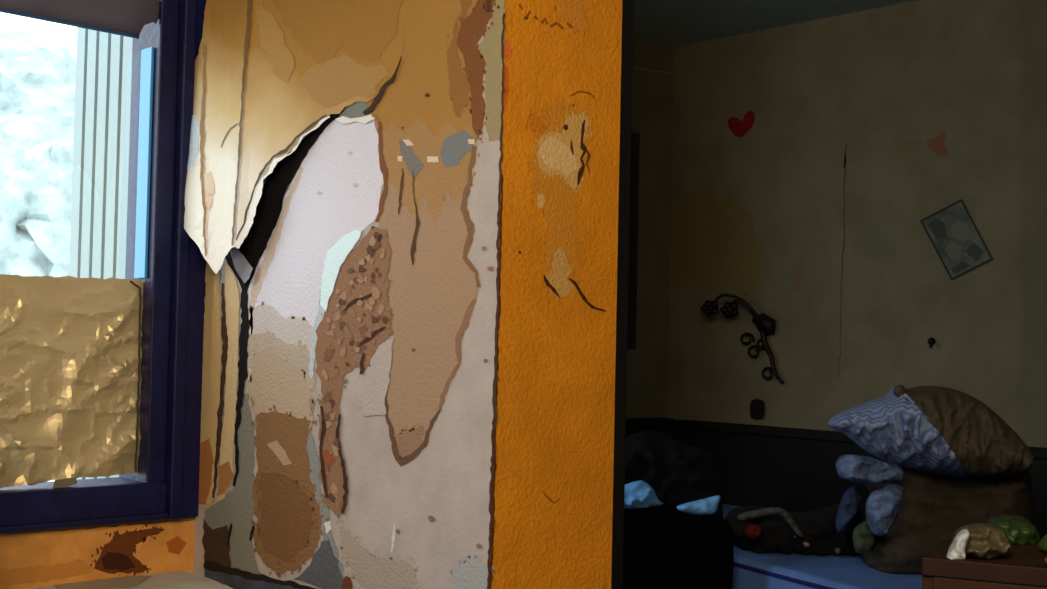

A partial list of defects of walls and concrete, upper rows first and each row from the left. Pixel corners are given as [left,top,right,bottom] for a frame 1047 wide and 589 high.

peeling [397,130,475,178]
crack [570,90,595,185]
peeling [200,101,394,589]
spalling [487,13,505,589]
crack [543,275,606,311]
corrosion [90,522,187,577]